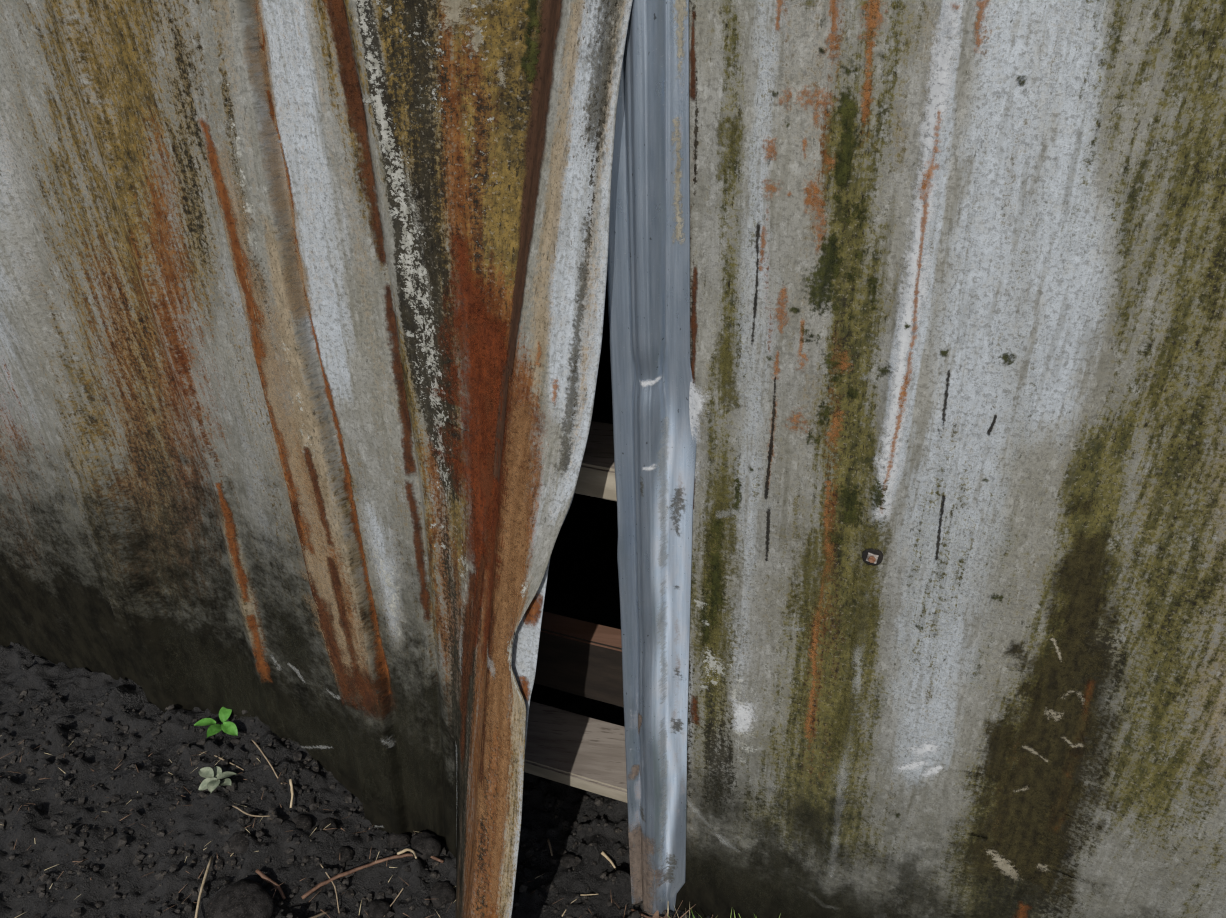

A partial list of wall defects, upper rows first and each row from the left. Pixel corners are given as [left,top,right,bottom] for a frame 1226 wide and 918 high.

corrosion [826,0,838,50]
corrosion [861,0,887,121]
corrosion [804,181,826,250]
corrosion [200,0,397,717]
corrosion [776,288,807,368]
corrosion [883,112,940,490]
corrosion [385,285,430,621]
corrosion [434,0,562,906]
water stain [733,468,754,513]
corrosion [805,481,833,737]
water stain [686,800,939,918]